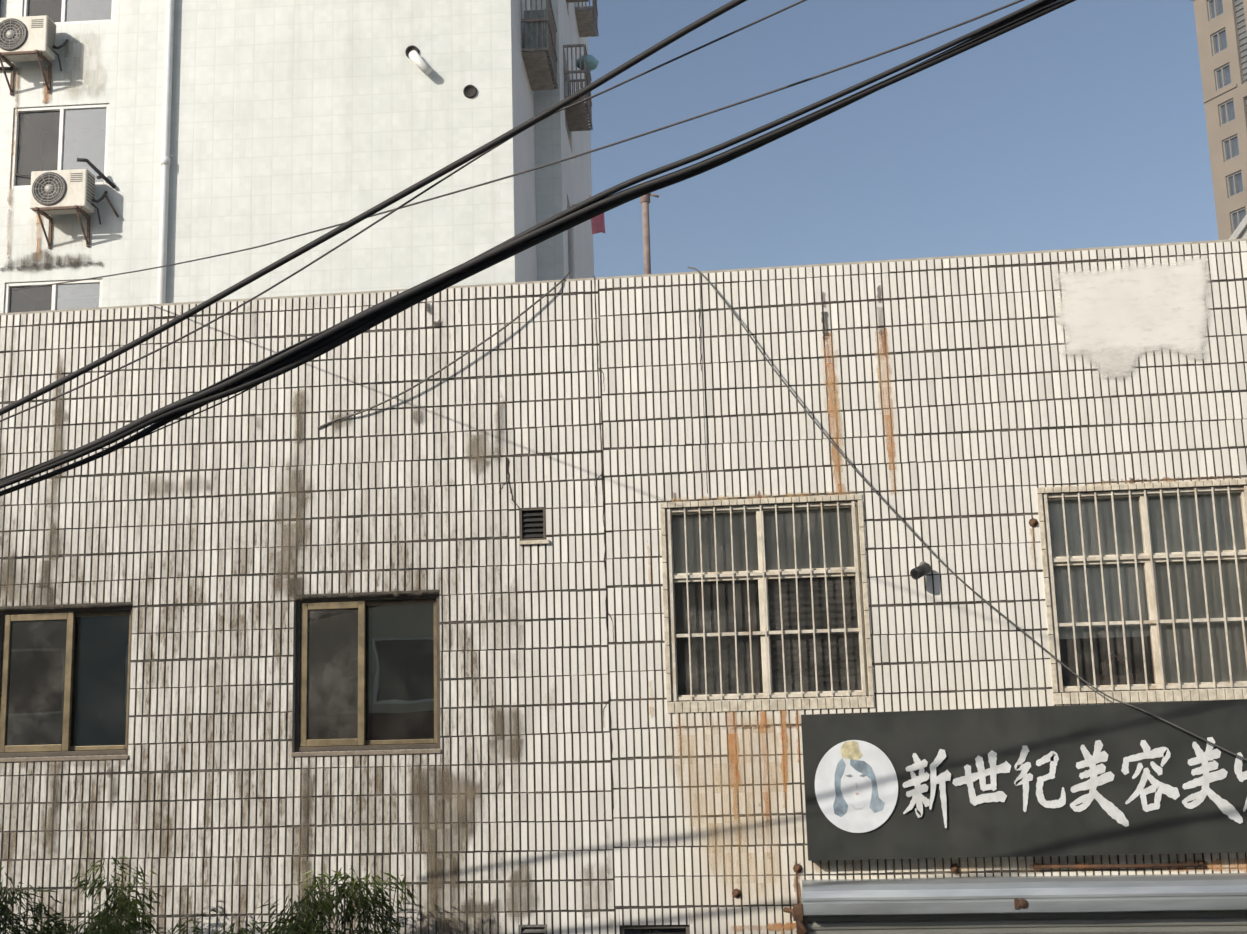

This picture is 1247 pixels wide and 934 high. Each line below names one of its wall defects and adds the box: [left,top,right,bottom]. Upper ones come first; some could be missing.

damp [294,392,304,443]
corrosion [821,293,841,495]
corrosion [885,415,895,470]
damp [275,465,308,600]
damp [490,711,520,759]
corrosion [719,710,799,818]
damp [409,768,497,934]
damp [509,866,528,917]
corrosion [767,923,796,933]